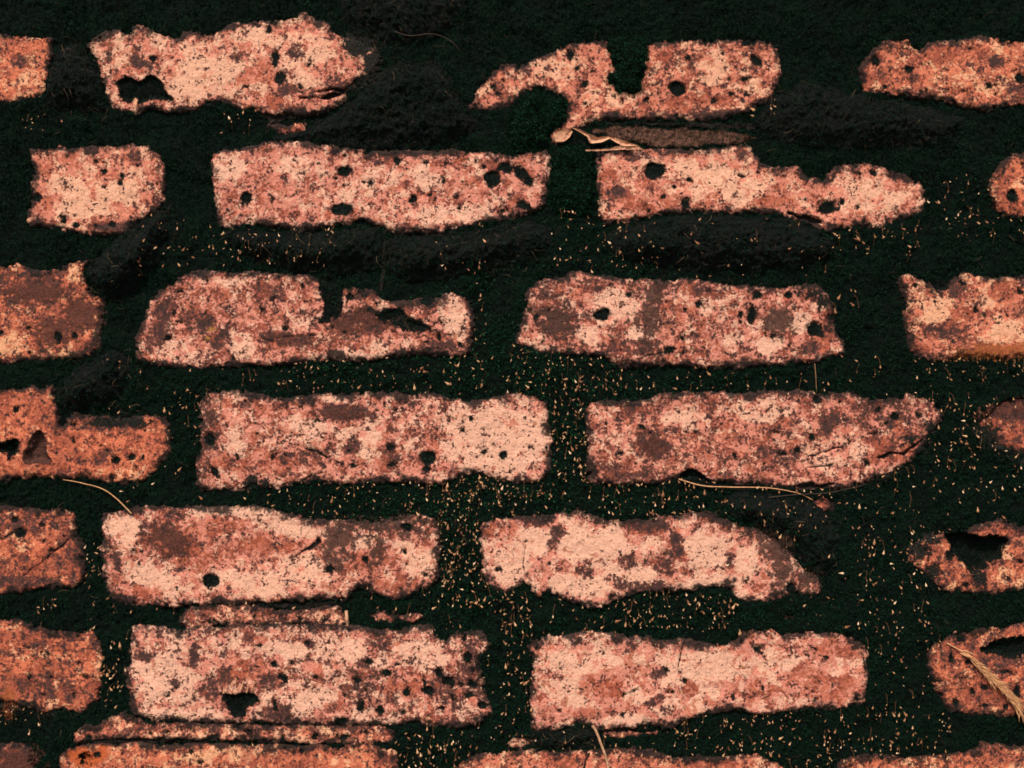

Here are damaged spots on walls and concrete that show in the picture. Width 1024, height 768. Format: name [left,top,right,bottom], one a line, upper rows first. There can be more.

spalling [115,55,188,105]
hole [93,159,124,189]
hole [89,438,144,480]
hole [463,442,516,473]
crack [24,535,77,575]
spalling [944,528,1009,589]
hole [926,653,991,708]